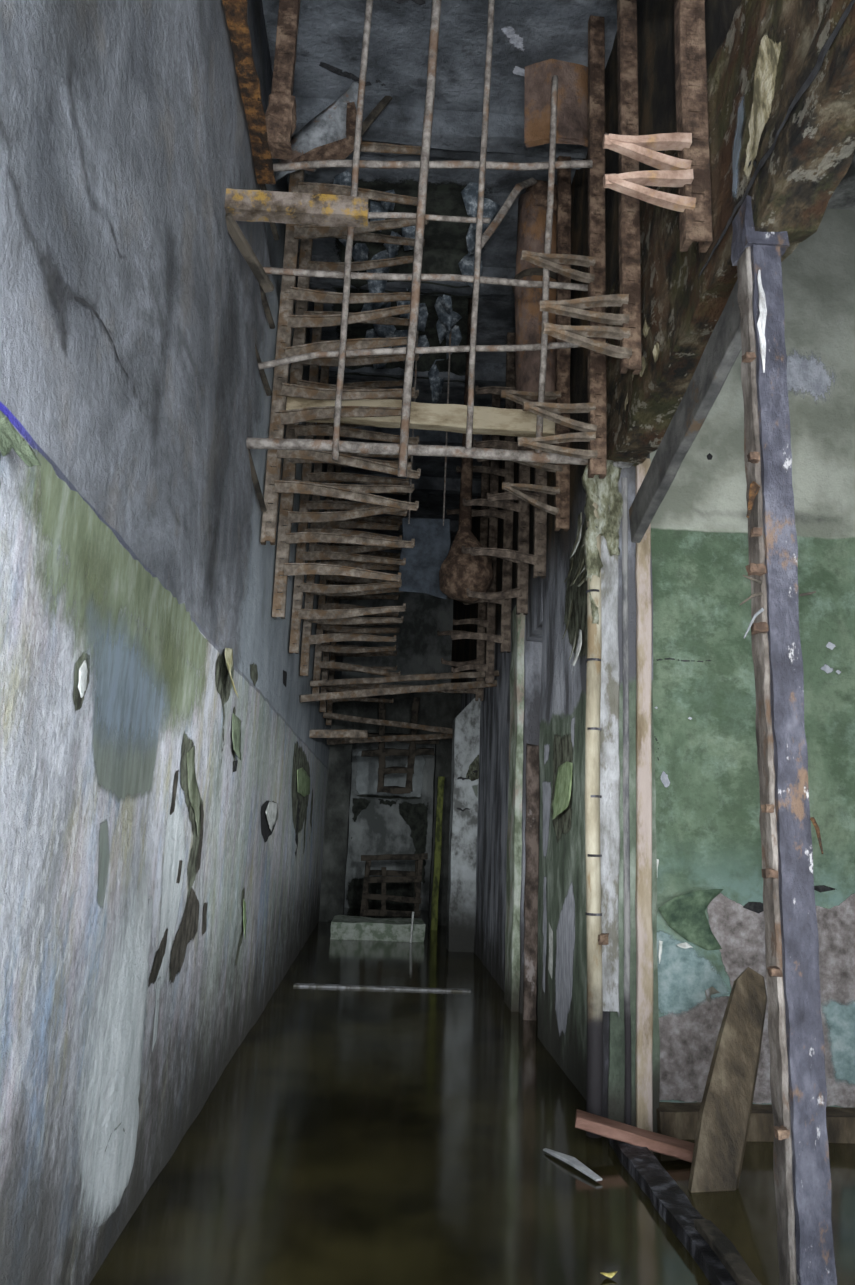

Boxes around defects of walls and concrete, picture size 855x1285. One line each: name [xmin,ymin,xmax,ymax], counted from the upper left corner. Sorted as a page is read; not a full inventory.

crack [70,93,89,192]
crack [15,182,137,397]
damp [787,350,835,401]
peeling [0,410,41,467]
damp [93,625,183,800]
peeling [215,648,241,772]
spalling [250,663,258,686]
damp [97,820,109,907]
peeling [148,731,208,987]
peeling [261,741,313,855]
peeling [658,889,772,1104]
peeling [814,885,855,1108]